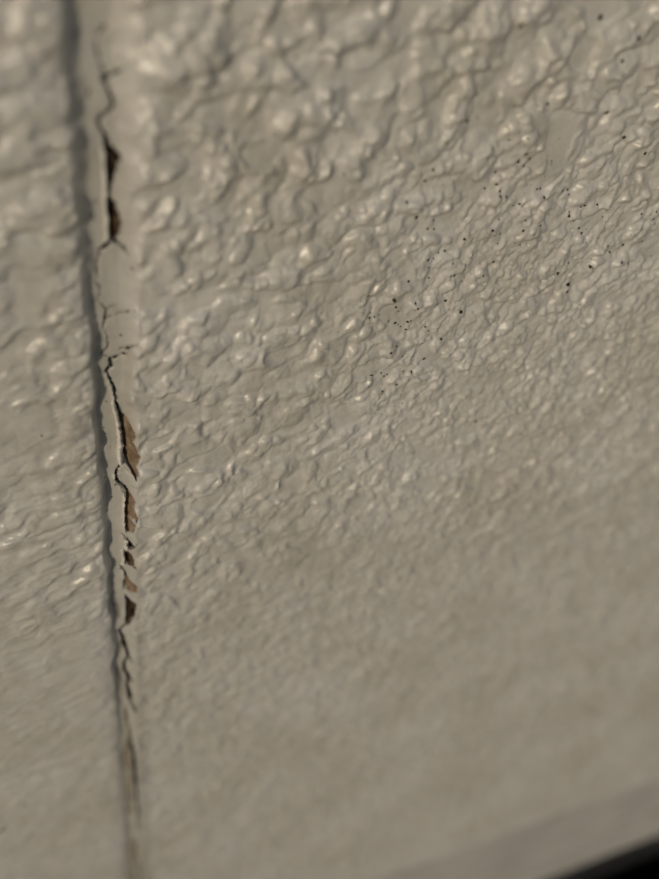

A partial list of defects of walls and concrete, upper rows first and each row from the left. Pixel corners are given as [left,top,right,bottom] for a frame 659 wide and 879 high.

crack [86,24,139,414]
crack [112,465,126,491]
peeling [114,408,141,625]